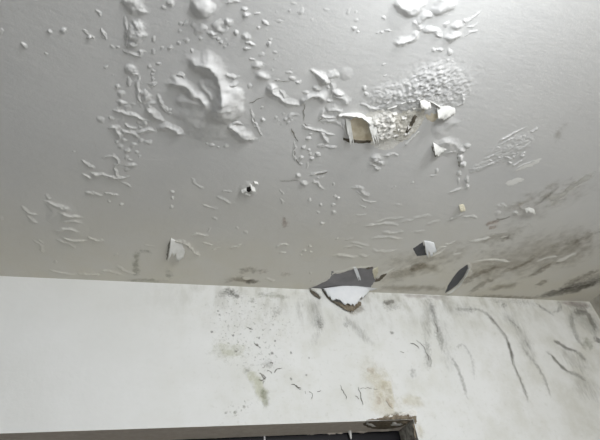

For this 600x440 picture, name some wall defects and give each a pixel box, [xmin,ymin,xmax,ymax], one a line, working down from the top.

peeling [338,47,541,193]
peeling [166,227,221,261]
peeling [411,239,448,258]
peeling [308,264,397,312]
peeling [443,263,473,295]
spalling [363,409,417,439]